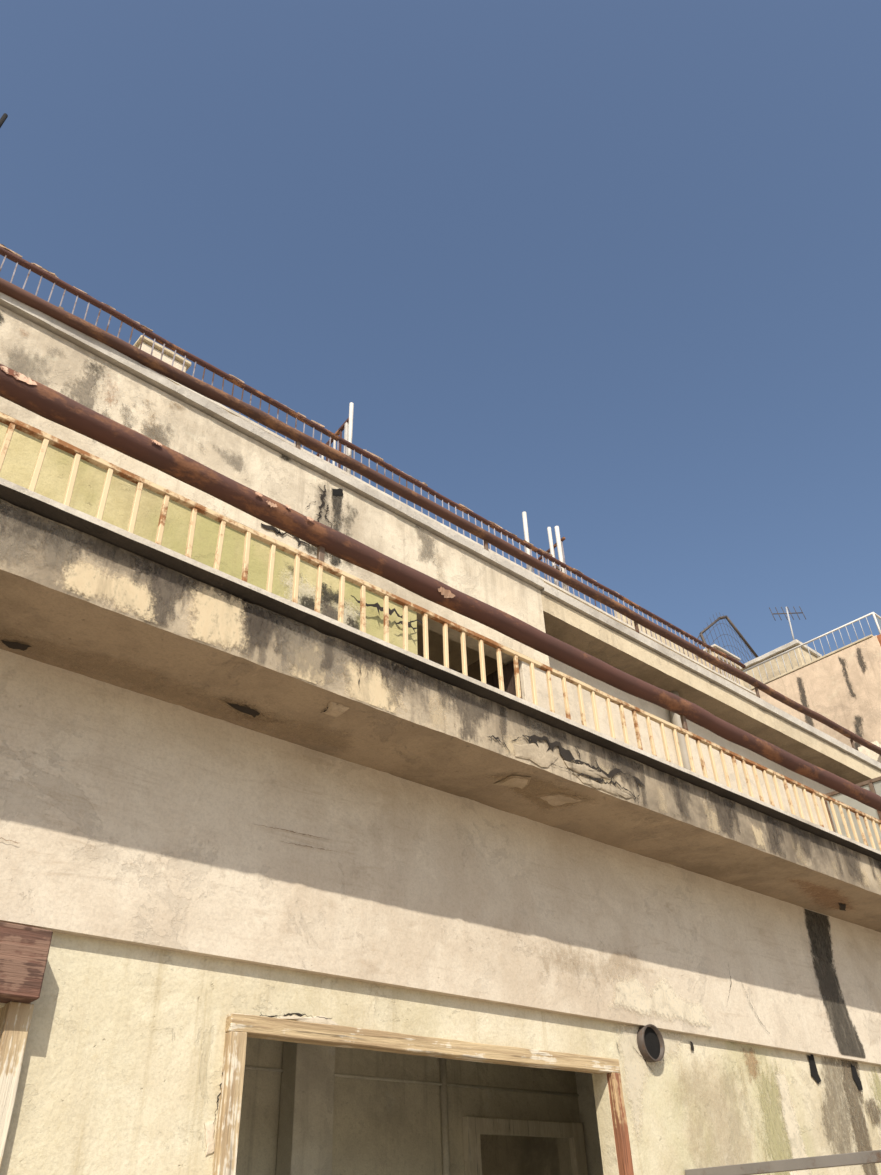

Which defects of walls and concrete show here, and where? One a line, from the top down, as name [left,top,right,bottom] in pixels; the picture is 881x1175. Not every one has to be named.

leakage [61,363,170,448]
crack [261,485,332,546]
leakage [122,554,193,627]
leakage [286,566,360,630]
leakage [243,607,518,752]
leakage [797,677,814,727]
leakage [838,648,866,697]
leakage [854,716,863,751]
crack [487,735,644,803]
leakage [668,777,690,816]
leakage [712,797,811,856]
leakage [805,909,881,1175]